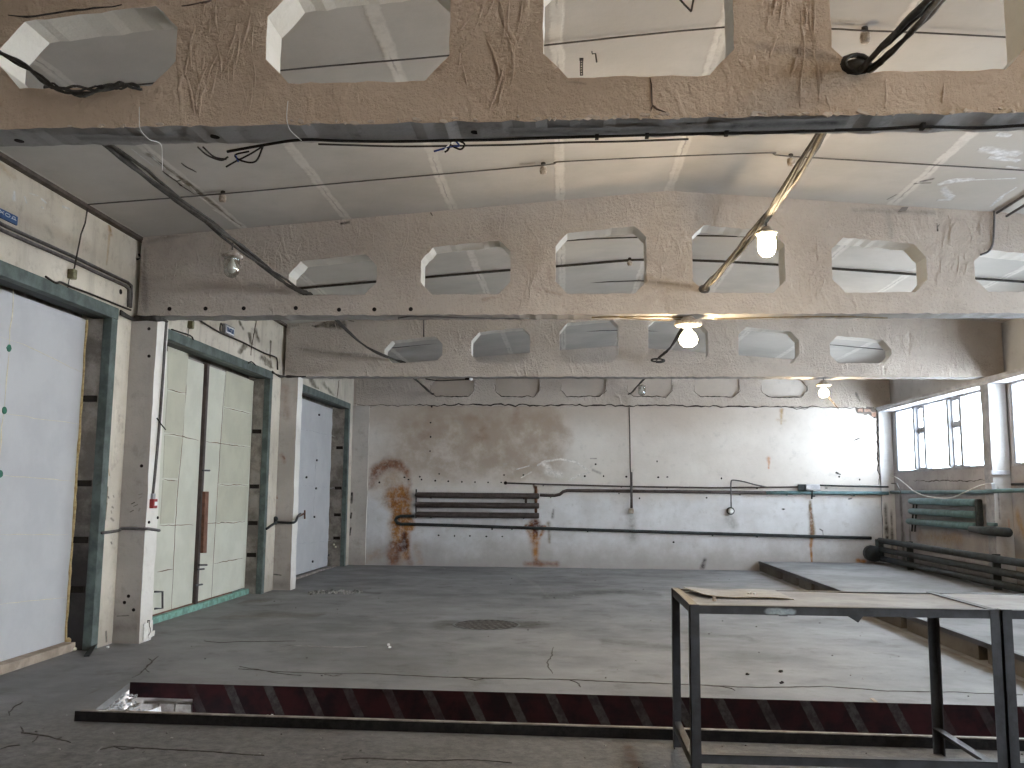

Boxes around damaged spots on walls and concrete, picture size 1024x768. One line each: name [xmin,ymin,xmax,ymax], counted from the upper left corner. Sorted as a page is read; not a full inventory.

crack [650,79,666,113]
rust [366,454,426,566]
rust [521,518,561,567]
rust [807,499,817,562]